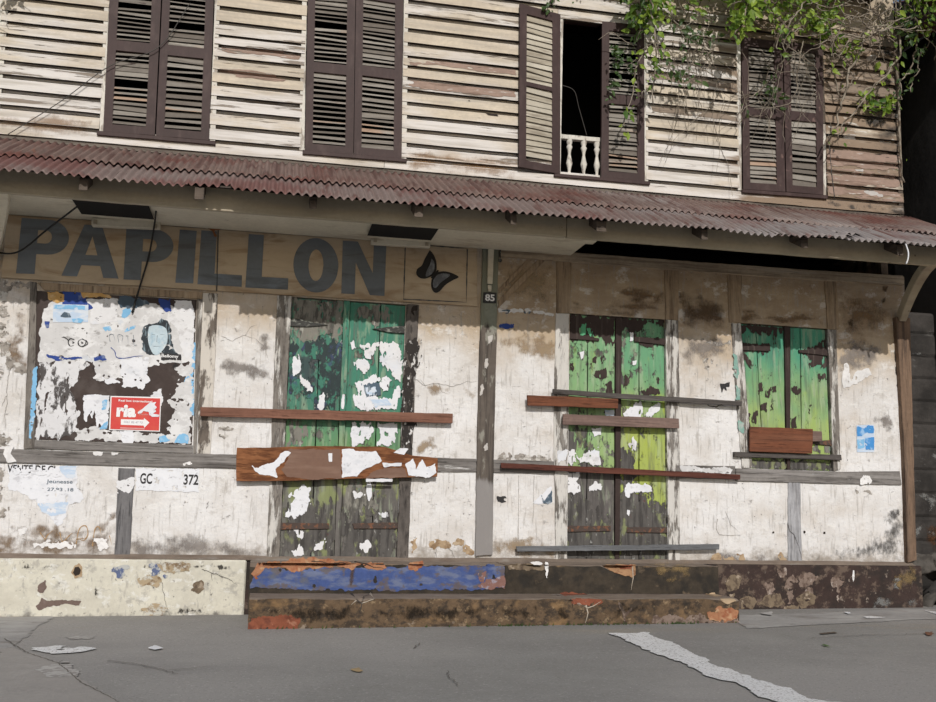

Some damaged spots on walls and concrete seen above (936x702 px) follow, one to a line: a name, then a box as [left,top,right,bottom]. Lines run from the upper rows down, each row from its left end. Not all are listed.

peeling [287,297,344,411]
peeling [400,337,422,449]
peeling [569,314,664,395]
leakage [680,296,721,321]
peeling [706,324,784,400]
leakage [840,287,888,367]
peeling [250,478,545,592]
peeling [567,446,667,589]
peeling [36,580,81,610]
peeling [191,580,205,594]
leakage [292,609,348,622]
leakage [406,606,474,619]